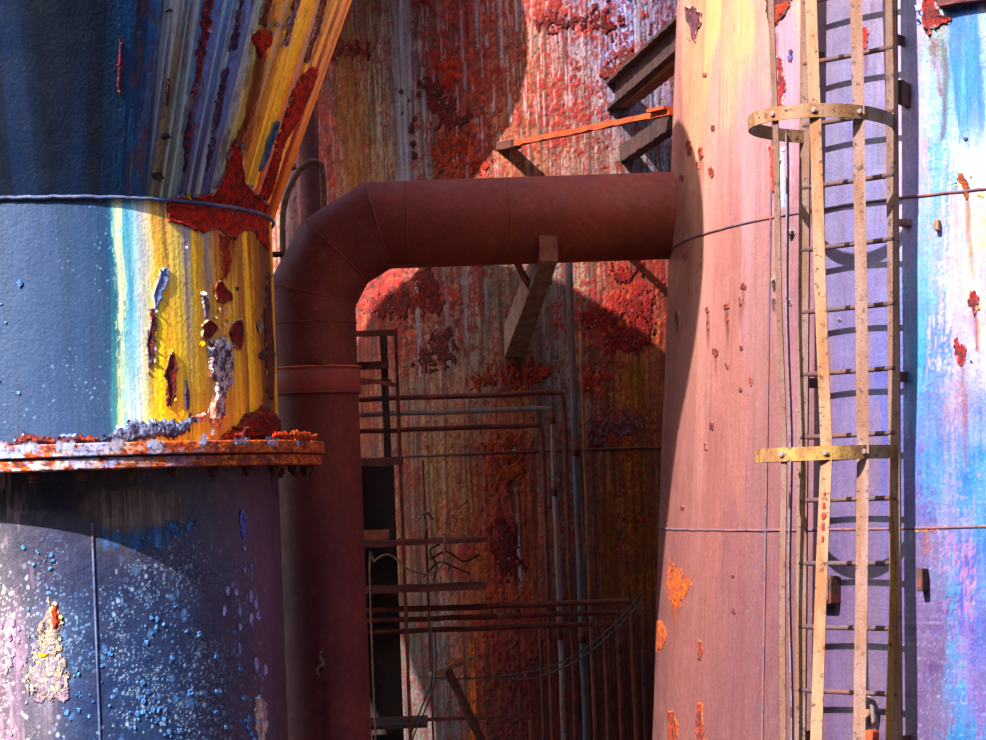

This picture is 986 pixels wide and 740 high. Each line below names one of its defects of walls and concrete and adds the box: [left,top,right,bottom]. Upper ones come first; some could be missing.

peeling [191,0,215,97]
peeling [282,0,301,48]
peeling [915,0,952,37]
peeling [206,67,230,172]
peeling [259,115,280,172]
rust [495,106,673,151]
peeling [95,265,250,449]
peeling [256,272,276,408]
rust [666,558,693,612]
peeling [0,586,95,721]
rust [667,710,678,740]
rust [695,702,704,740]